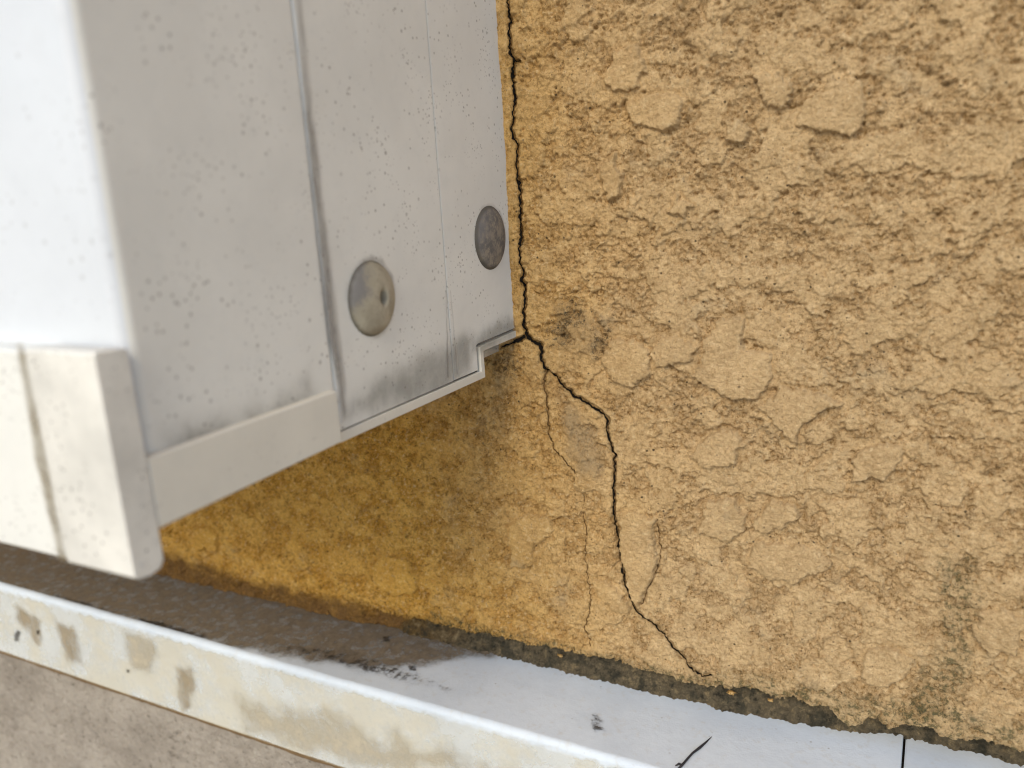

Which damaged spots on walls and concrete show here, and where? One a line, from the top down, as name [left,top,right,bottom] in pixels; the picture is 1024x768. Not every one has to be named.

crack [501,0,712,677]
leakage [179,670,194,707]